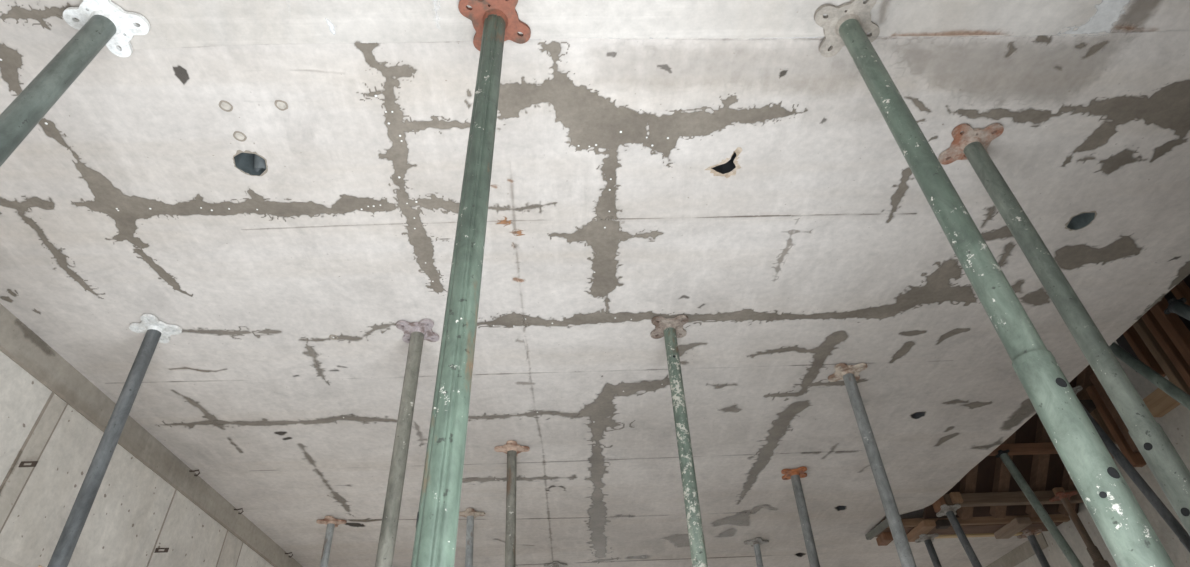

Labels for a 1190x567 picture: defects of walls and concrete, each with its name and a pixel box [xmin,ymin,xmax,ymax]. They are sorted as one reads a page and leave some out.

damp [0,2,76,30]
peeling [1059,0,1130,36]
damp [0,43,23,96]
spalling [173,66,189,84]
damp [946,80,1190,175]
damp [39,42,471,297]
spalling [705,147,743,178]
damp [0,196,105,299]
damp [1054,235,1142,270]
damp [477,41,977,537]
damp [158,390,397,453]
damp [462,375,670,563]